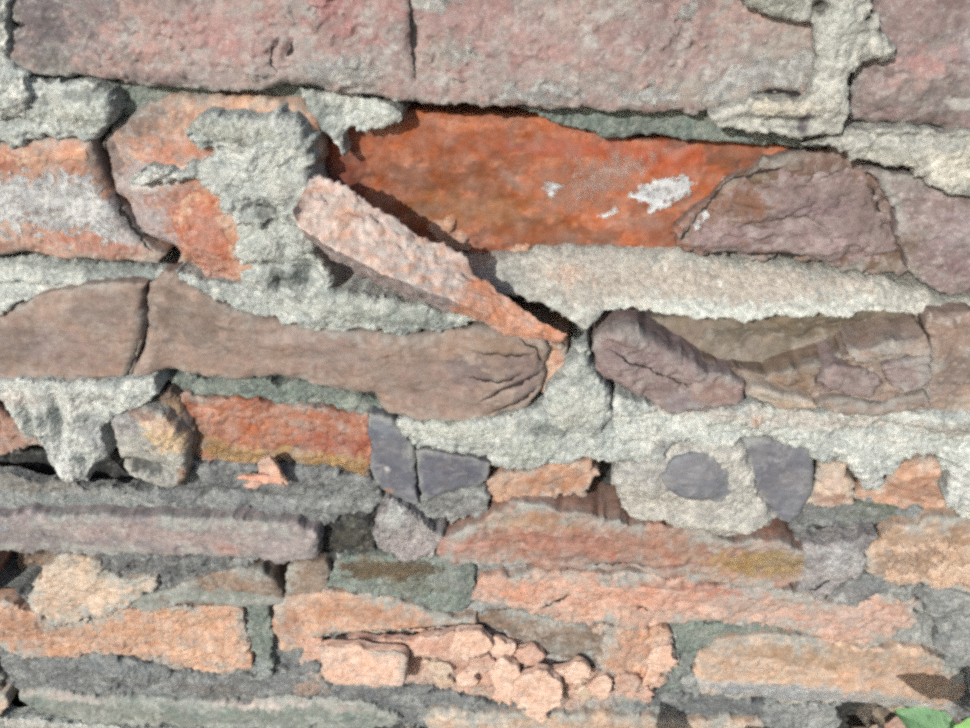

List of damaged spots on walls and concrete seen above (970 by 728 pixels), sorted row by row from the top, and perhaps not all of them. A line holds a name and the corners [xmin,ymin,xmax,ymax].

crack [408,0,417,78]
crack [127,341,139,375]